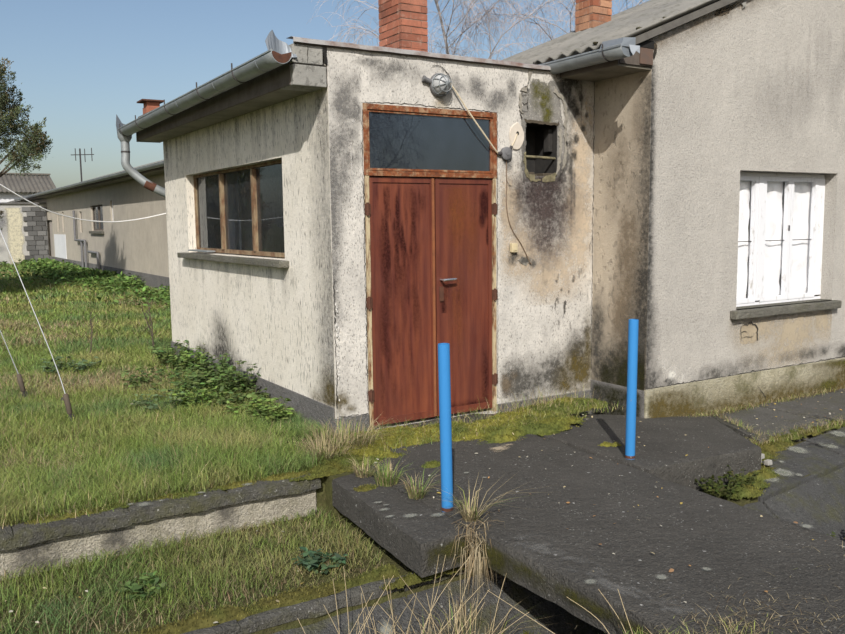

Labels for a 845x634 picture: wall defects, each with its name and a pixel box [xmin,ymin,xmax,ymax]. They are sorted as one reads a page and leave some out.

rust [382,191,415,282]
rust [480,192,488,244]
water stain [501,66,684,399]
spalling [740,321,758,344]